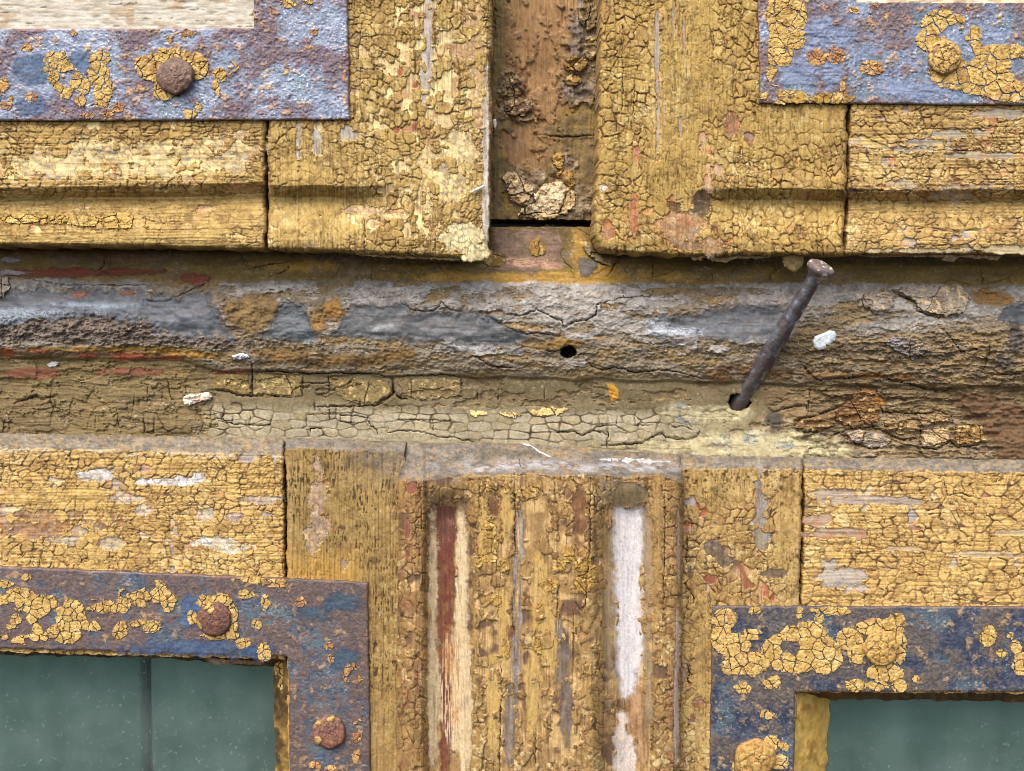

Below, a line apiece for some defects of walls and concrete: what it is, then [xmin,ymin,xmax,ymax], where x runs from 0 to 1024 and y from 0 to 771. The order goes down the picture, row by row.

crack [621,38,635,119]
peeling [418,0,598,275]
peeling [183,372,303,406]
crack [212,356,513,442]
peeling [332,376,461,404]
crack [551,417,700,446]
corrosion [707,365,752,385]
peeling [812,330,837,350]
peeling [637,388,1024,460]
peeling [426,475,540,771]
peeling [612,507,645,699]
peeling [613,712,637,771]